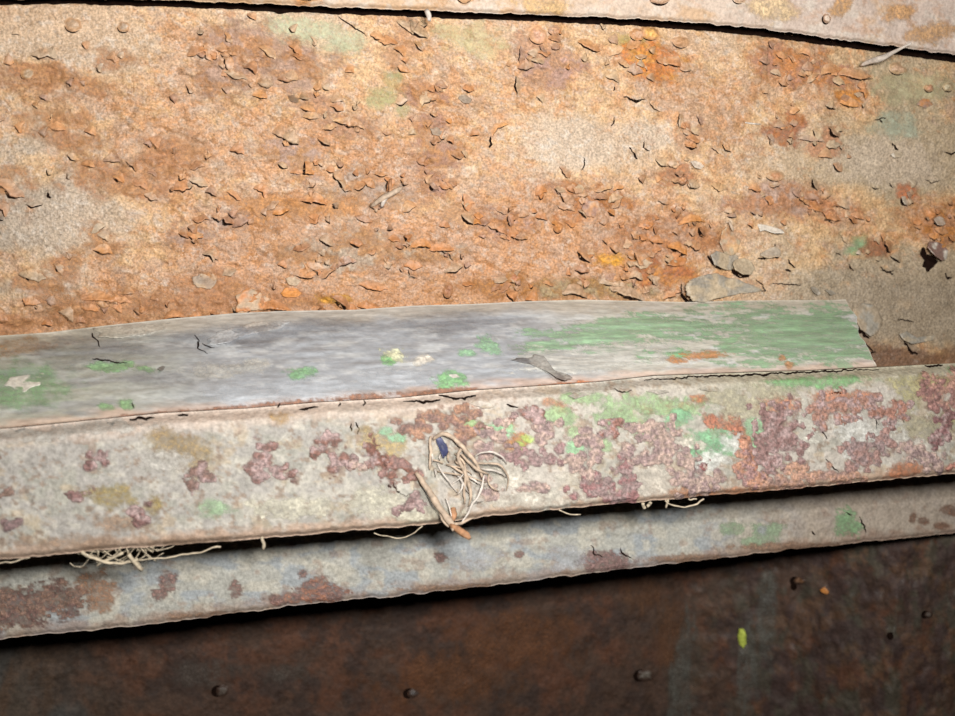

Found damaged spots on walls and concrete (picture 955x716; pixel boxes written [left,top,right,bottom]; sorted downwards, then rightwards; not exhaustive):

crack [0,0,955,63]
corrosion [628,26,690,49]
corrosion [0,46,212,202]
spalling [170,12,871,303]
spalling [898,178,918,206]
spalling [856,233,901,263]
spalling [913,198,955,260]
corrosion [0,252,395,354]
peeling [513,354,572,380]
corrosion [391,366,955,505]
corrosion [310,429,427,517]
corrosion [0,567,116,631]